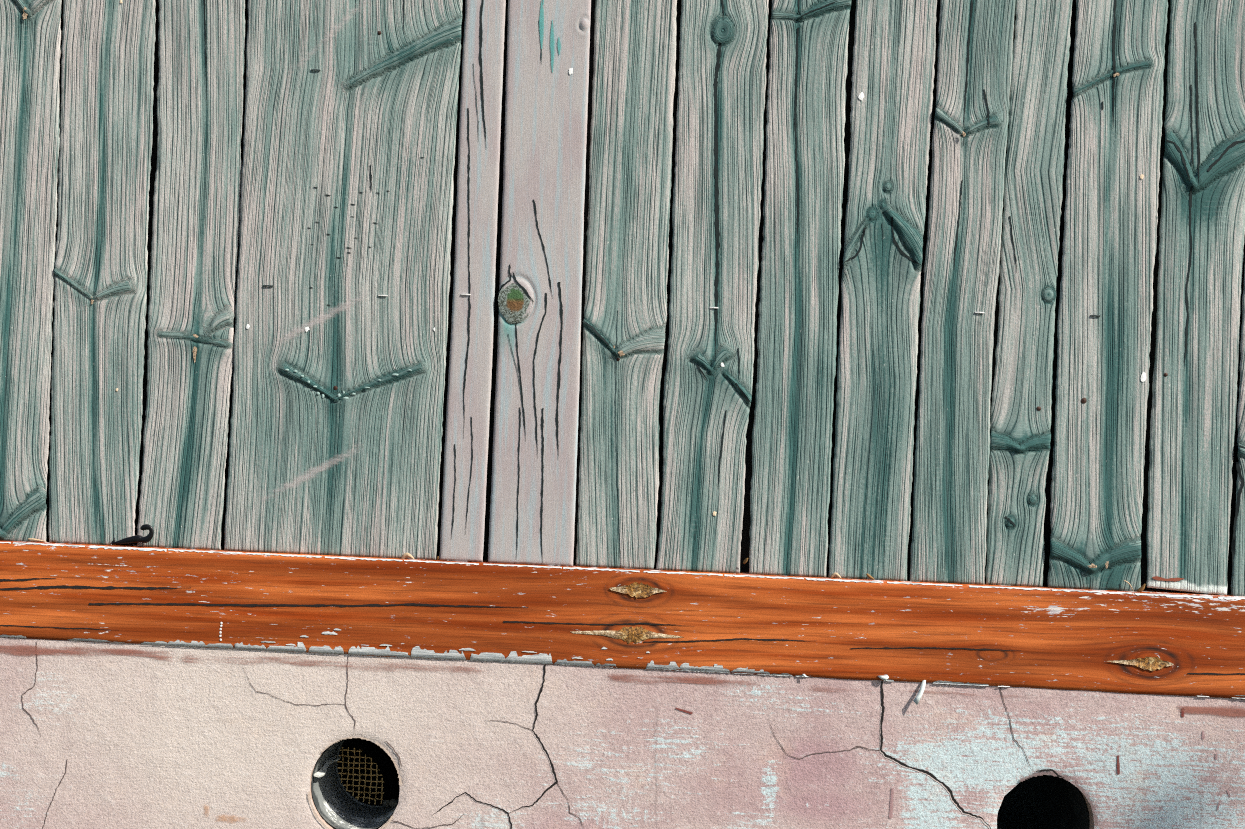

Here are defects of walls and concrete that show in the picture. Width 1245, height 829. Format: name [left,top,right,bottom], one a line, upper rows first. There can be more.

peeling [141,628,617,668]
crack [0,578,804,735]
crack [391,665,584,829]
peeling [638,651,808,677]
crack [771,681,991,829]
crack [851,645,1021,653]
peeling [913,680,1010,705]
crack [1000,687,1064,778]